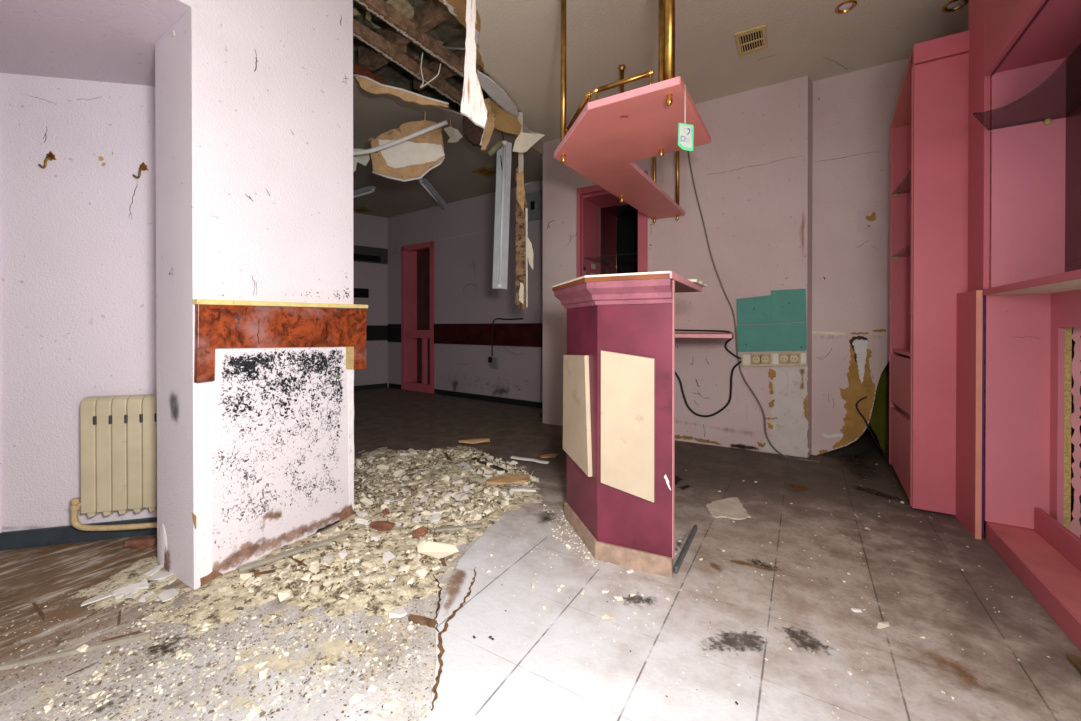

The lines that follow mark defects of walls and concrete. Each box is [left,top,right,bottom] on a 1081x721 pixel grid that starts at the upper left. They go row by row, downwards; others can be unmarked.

peeling [353,33,461,106]
peeling [355,0,464,77]
spalling [372,156,445,182]
peeling [819,336,876,454]
leakage [200,348,354,586]
crack [425,567,476,717]